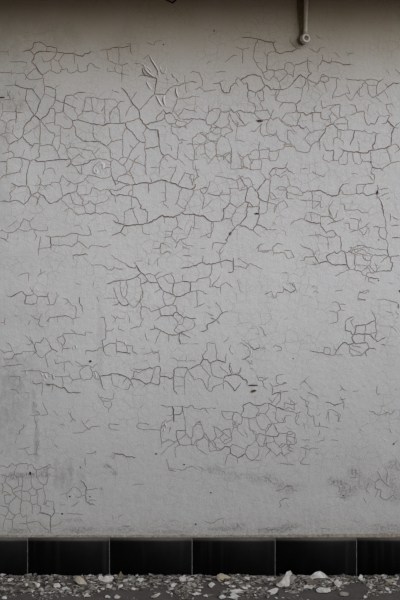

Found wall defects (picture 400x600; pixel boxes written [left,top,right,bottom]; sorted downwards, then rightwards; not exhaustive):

peeling [142,56,179,106]
crack [0,36,400,474]
crack [0,401,59,534]
crack [60,480,98,515]
crack [264,477,296,508]
crack [350,467,399,502]